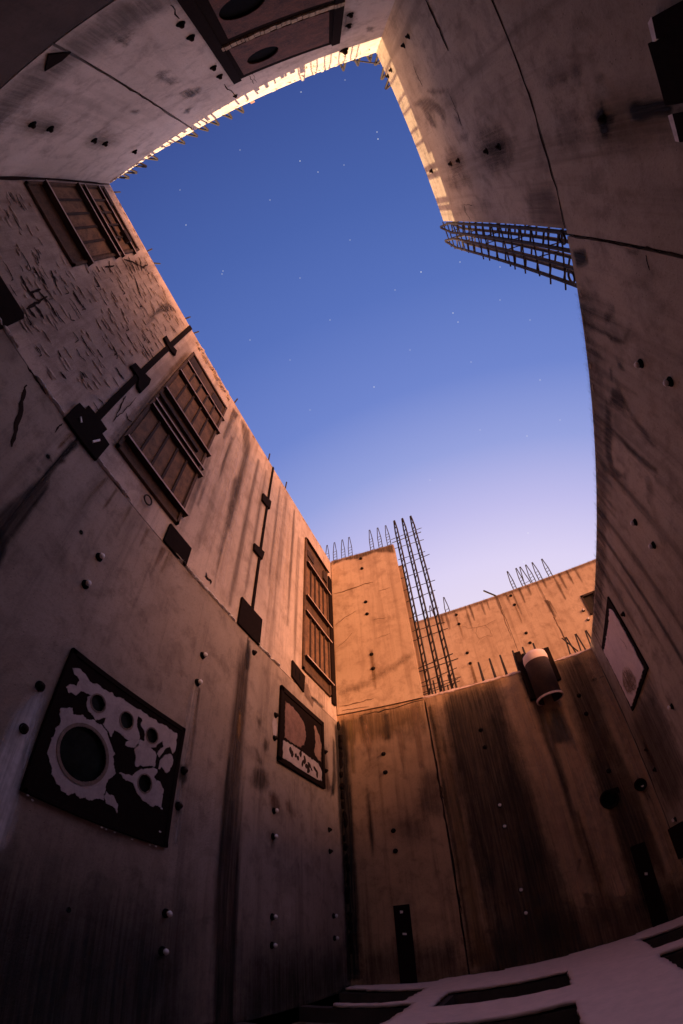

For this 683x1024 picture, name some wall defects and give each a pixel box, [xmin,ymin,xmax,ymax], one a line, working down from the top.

peeling [0,49,391,410]
crack [491,0,683,270]
crack [10,350,66,447]
crack [343,698,469,967]
leakage [446,656,653,972]
leakage [661,885,683,921]